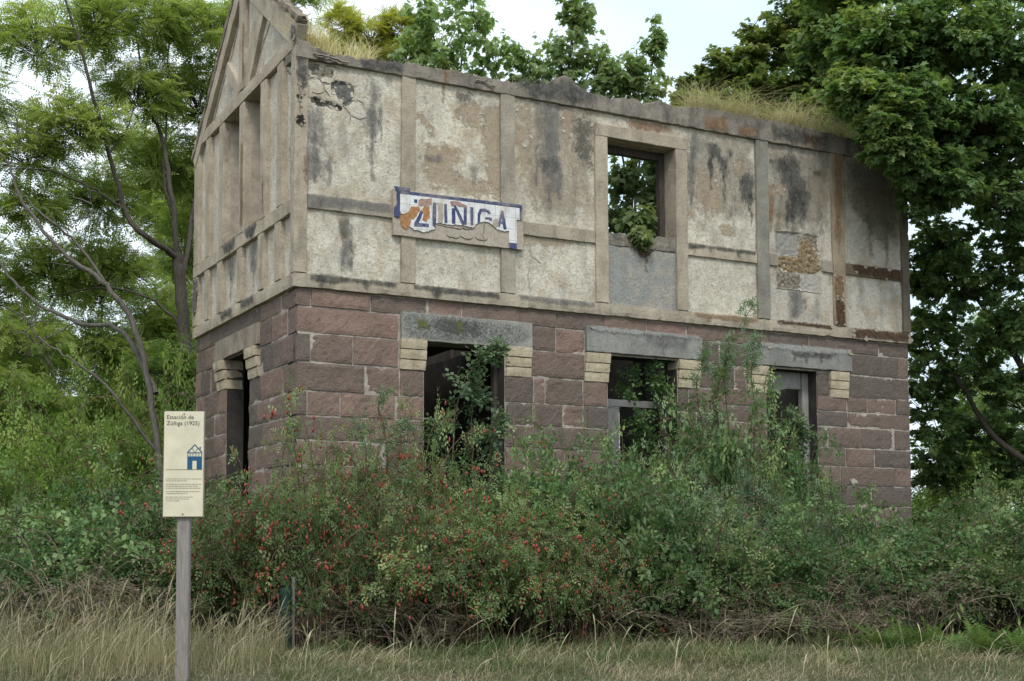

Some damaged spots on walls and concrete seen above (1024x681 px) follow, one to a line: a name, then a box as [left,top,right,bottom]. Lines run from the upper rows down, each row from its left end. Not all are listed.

crack [257,23,368,184]
leakage [308,108,331,182]
spalling [289,24,357,111]
leakage [367,84,382,147]
leakage [688,136,732,207]
leakage [740,174,754,218]
leakage [770,158,810,232]
leakage [308,195,396,288]
spalling [776,233,821,291]